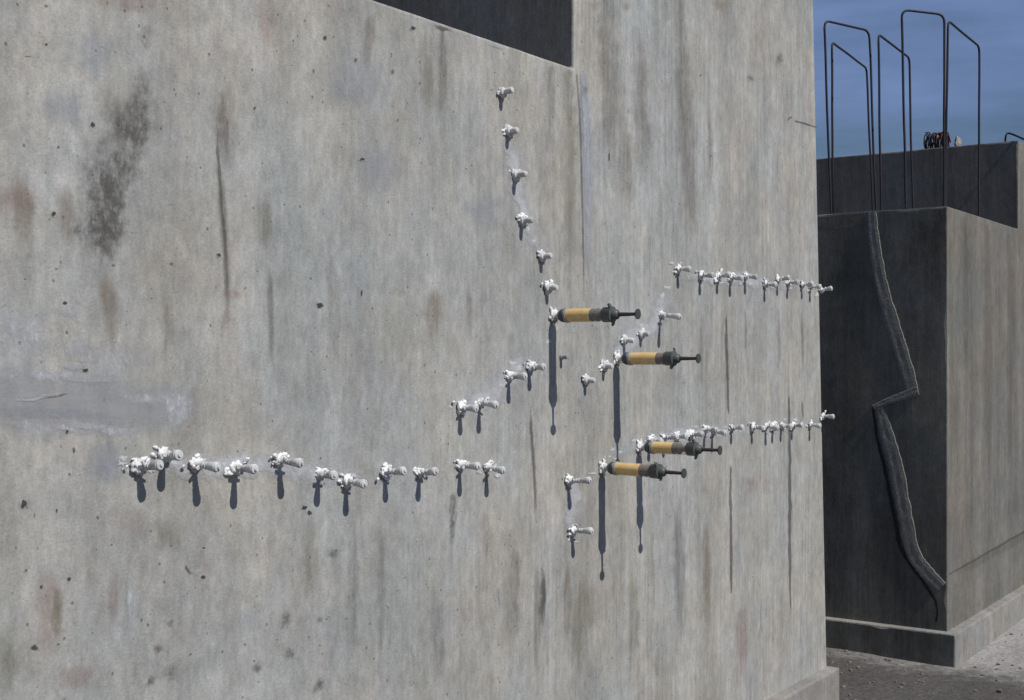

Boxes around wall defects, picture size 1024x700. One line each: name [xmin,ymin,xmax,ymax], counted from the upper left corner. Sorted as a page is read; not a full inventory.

crack [504,137,548,251]
crack [615,262,819,356]
crack [118,451,358,483]
crack [449,353,526,416]
crack [565,418,807,543]
crack [867,212,945,622]